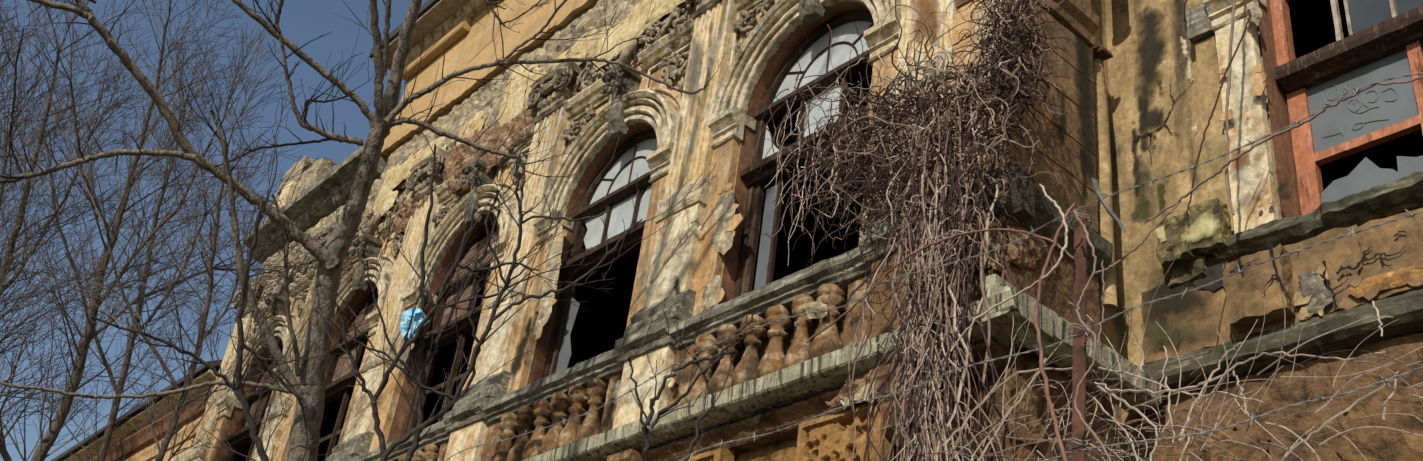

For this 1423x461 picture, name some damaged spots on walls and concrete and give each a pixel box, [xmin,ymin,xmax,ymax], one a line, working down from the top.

flaking render [362,0,685,240]
water stain [1059,0,1116,267]
water stain [1132,9,1165,196]
flaking render [259,205,345,294]
peeling [649,183,743,298]
flaking render [699,275,725,313]
water stain [1100,310,1119,353]
flaking render [1293,259,1423,321]
water stain [1102,396,1123,461]